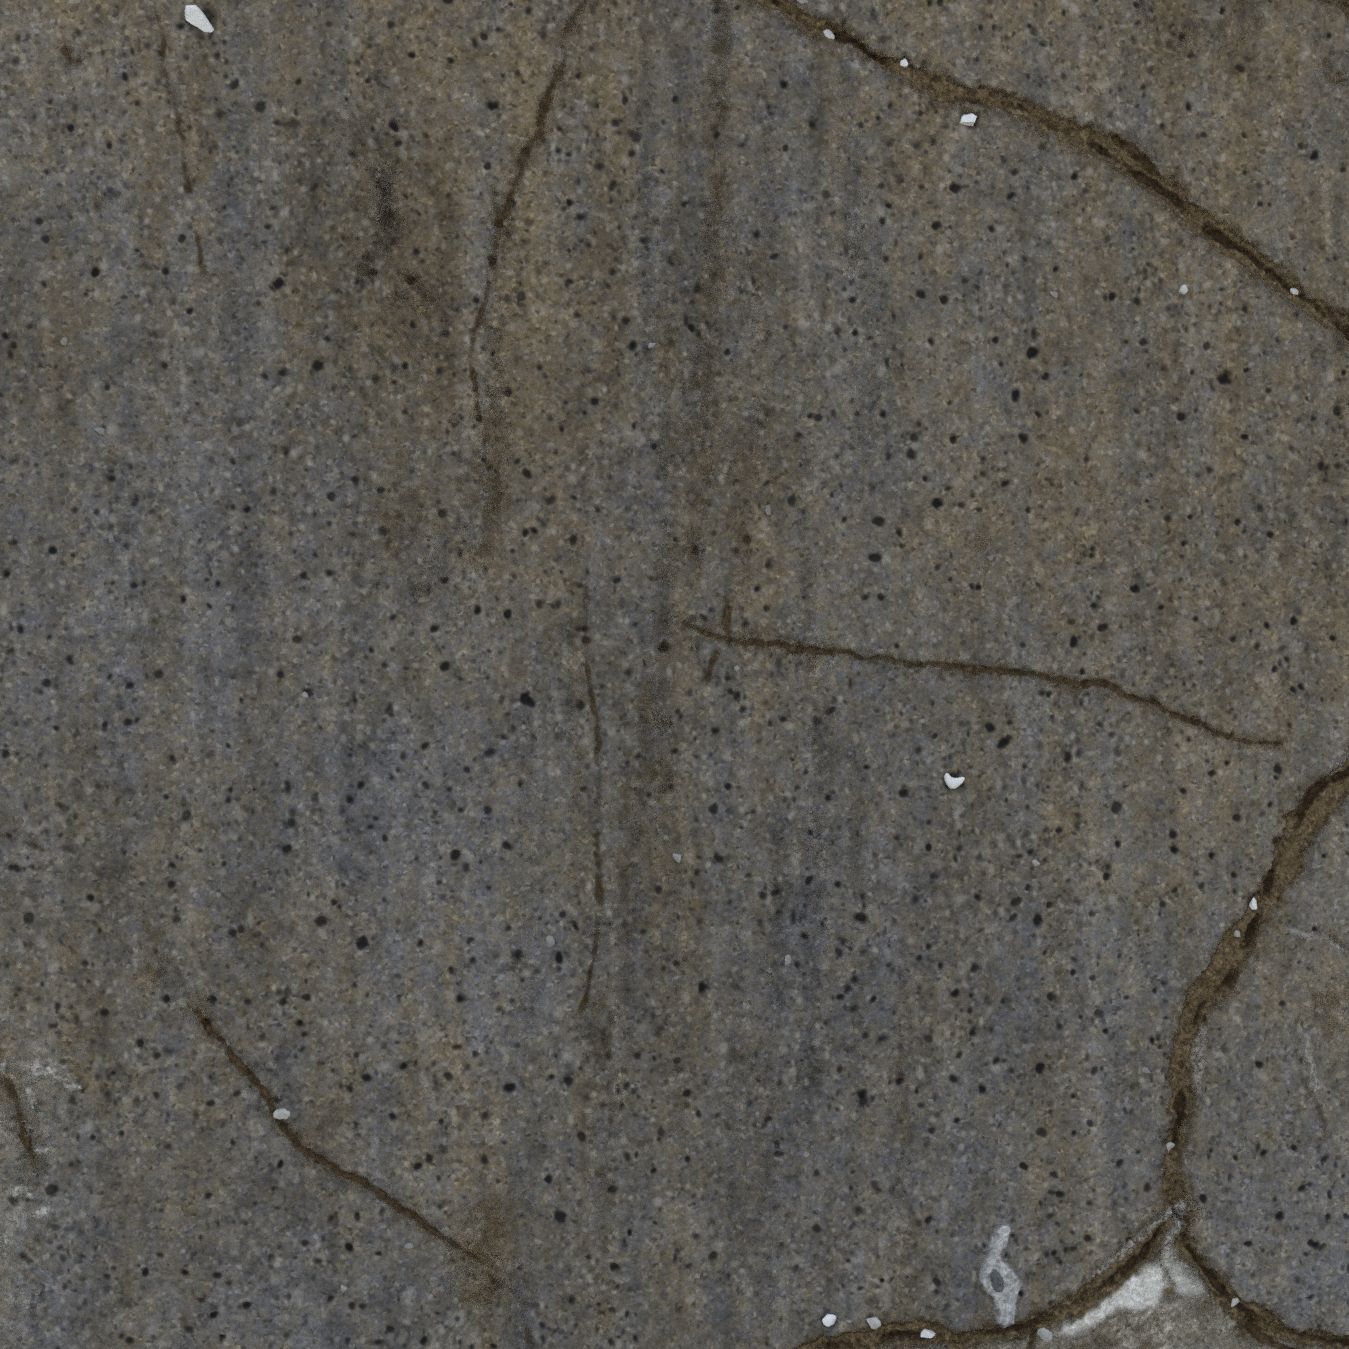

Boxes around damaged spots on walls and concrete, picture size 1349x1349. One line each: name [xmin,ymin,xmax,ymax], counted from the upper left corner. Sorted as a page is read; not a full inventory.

crack [495,64,563,245]
crack [749,0,1349,343]
crack [470,288,489,419]
crack [683,604,1284,748]
crack [194,1010,500,1287]
crack [798,749,1349,1349]